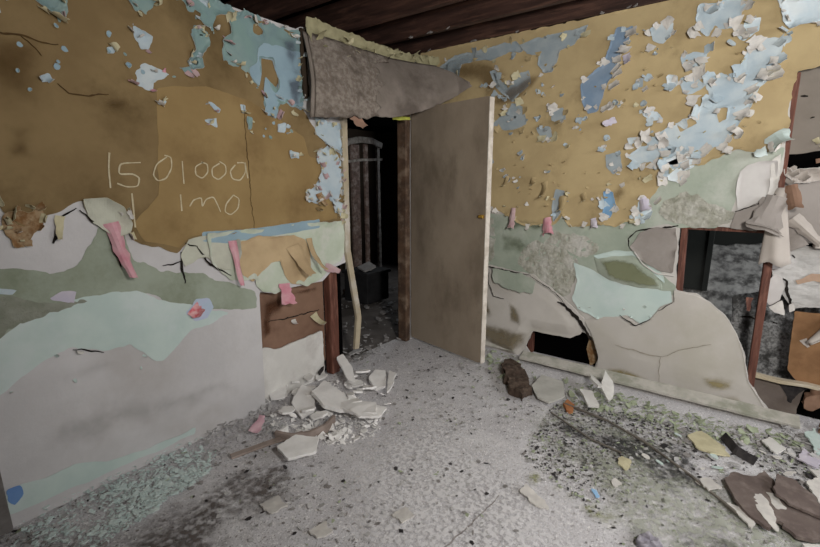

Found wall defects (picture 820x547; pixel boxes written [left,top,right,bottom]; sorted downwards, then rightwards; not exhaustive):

peeling [36,0,70,28]
crack [0,32,58,56]
peeling [39,60,60,83]
crack [57,83,109,97]
peeling [106,0,820,323]
flaking render [0,197,48,248]
peeling [0,227,257,395]
spalling [527,331,598,366]